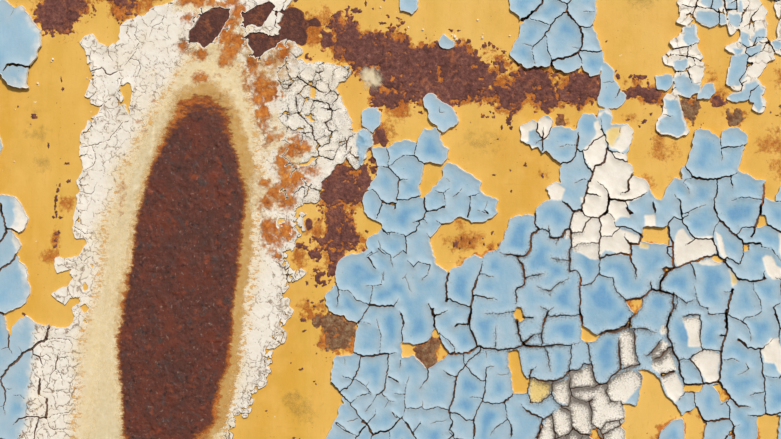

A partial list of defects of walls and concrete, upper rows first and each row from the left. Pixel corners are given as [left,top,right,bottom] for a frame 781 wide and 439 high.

corrosion [43,230,61,261]
corrosion [52,179,72,219]
corrosion [33,0,162,38]
crack [0,8,195,439]
peeling [0,0,235,439]
crack [237,186,306,414]
crack [216,0,355,187]
corrosion [70,0,601,439]
peeling [217,0,781,439]
crack [331,120,781,439]
corrosion [615,70,665,128]